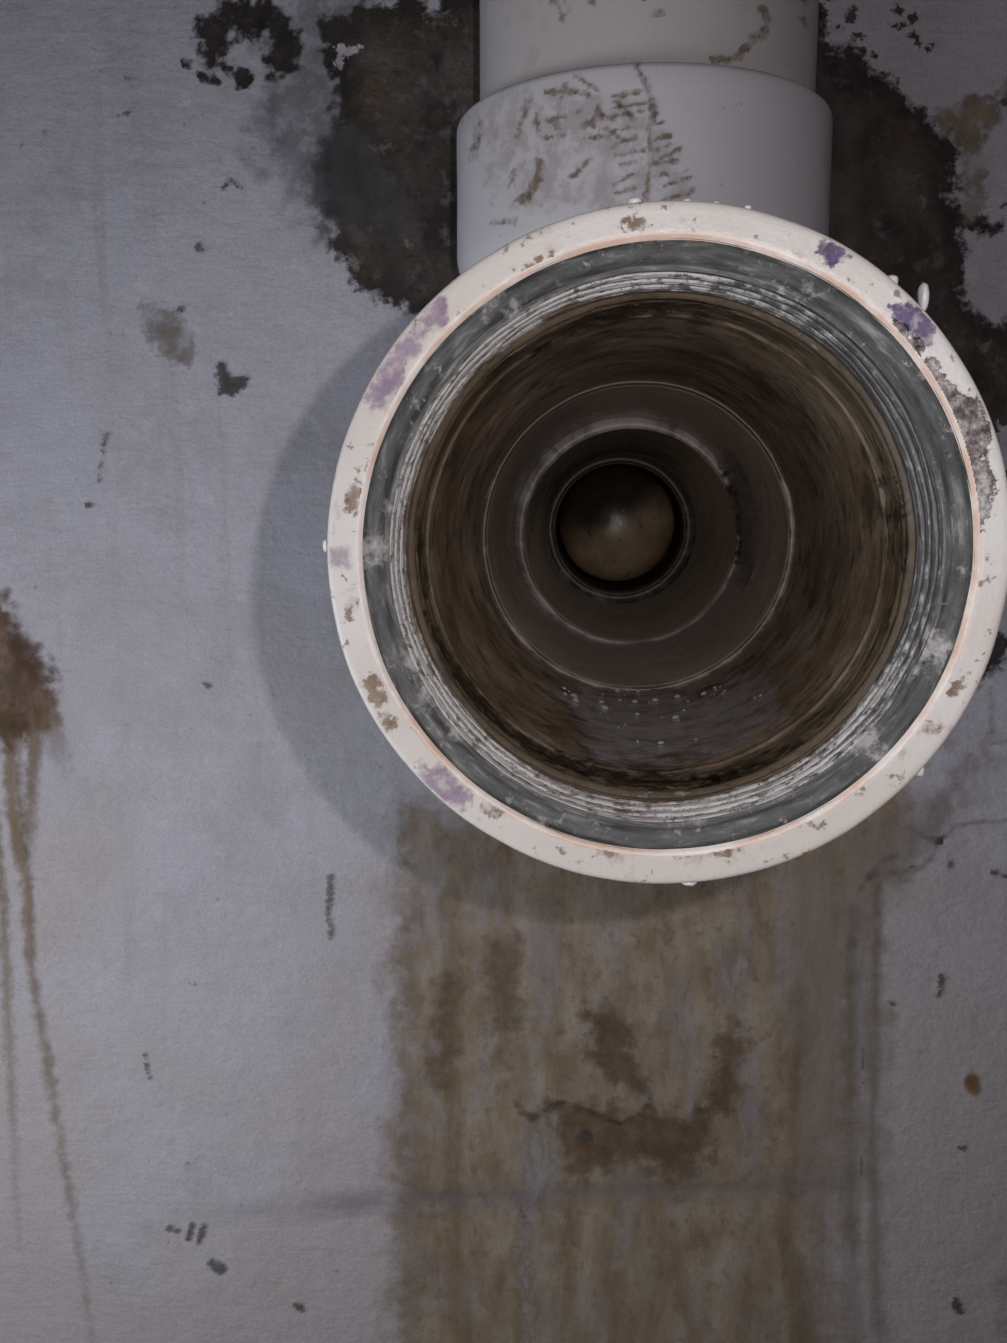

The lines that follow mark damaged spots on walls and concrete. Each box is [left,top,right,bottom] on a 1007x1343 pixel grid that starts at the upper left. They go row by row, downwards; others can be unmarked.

flaking render [816,0,1007,477]
rust [0,594,56,988]
flaking render [982,631,1007,679]
leakage [388,792,910,1343]